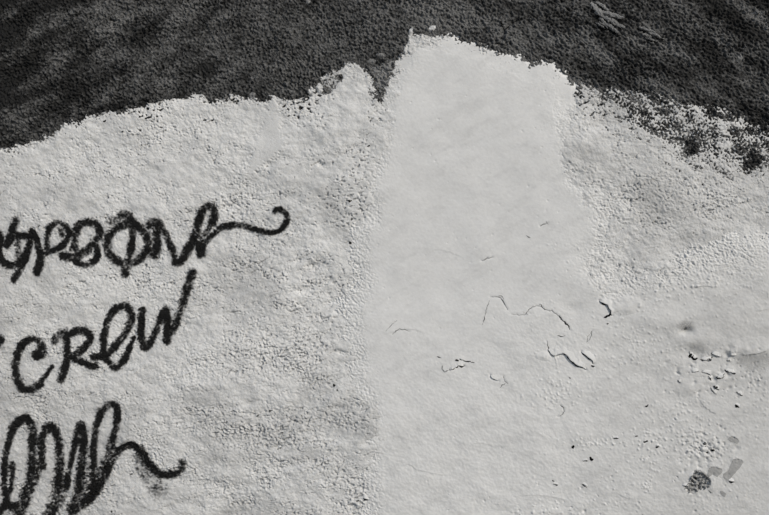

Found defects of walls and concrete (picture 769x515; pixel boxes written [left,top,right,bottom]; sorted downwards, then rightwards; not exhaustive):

crack [482,296,614,370]
peeling [688,352,736,394]
spalling [682,459,743,497]